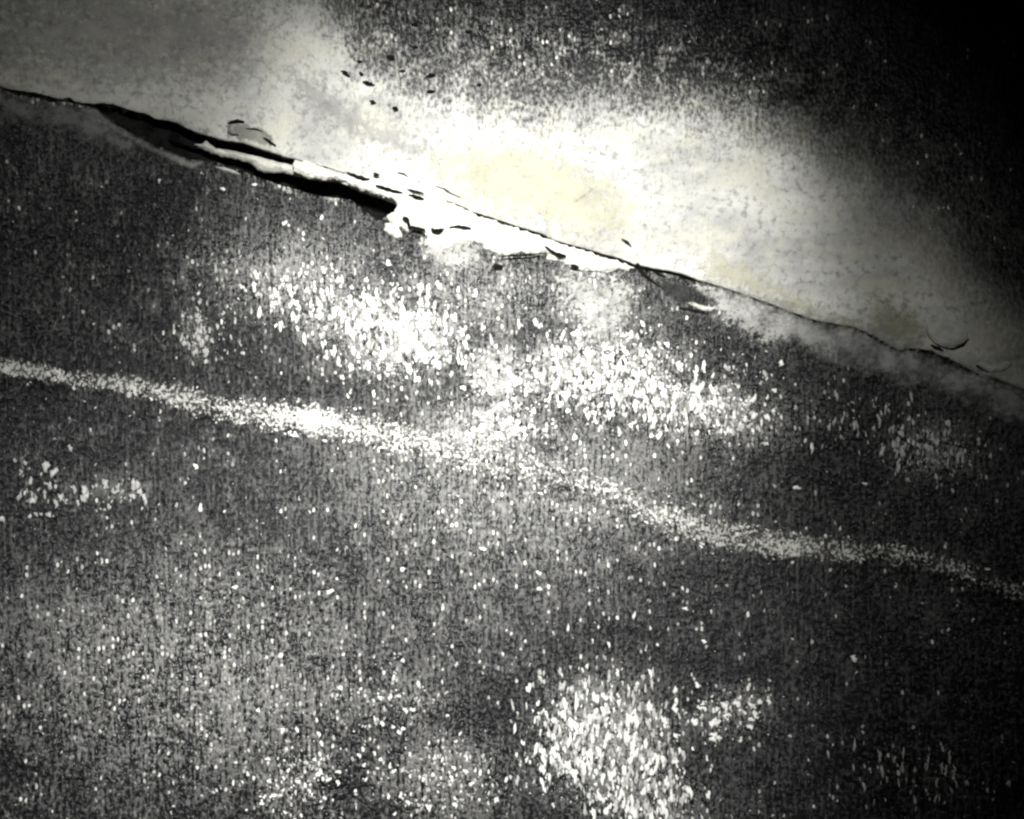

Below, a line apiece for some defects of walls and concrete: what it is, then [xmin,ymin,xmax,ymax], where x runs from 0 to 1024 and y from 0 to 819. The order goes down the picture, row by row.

spalling [226,119,276,147]
spalling [292,160,634,274]
crack [317,164,992,377]